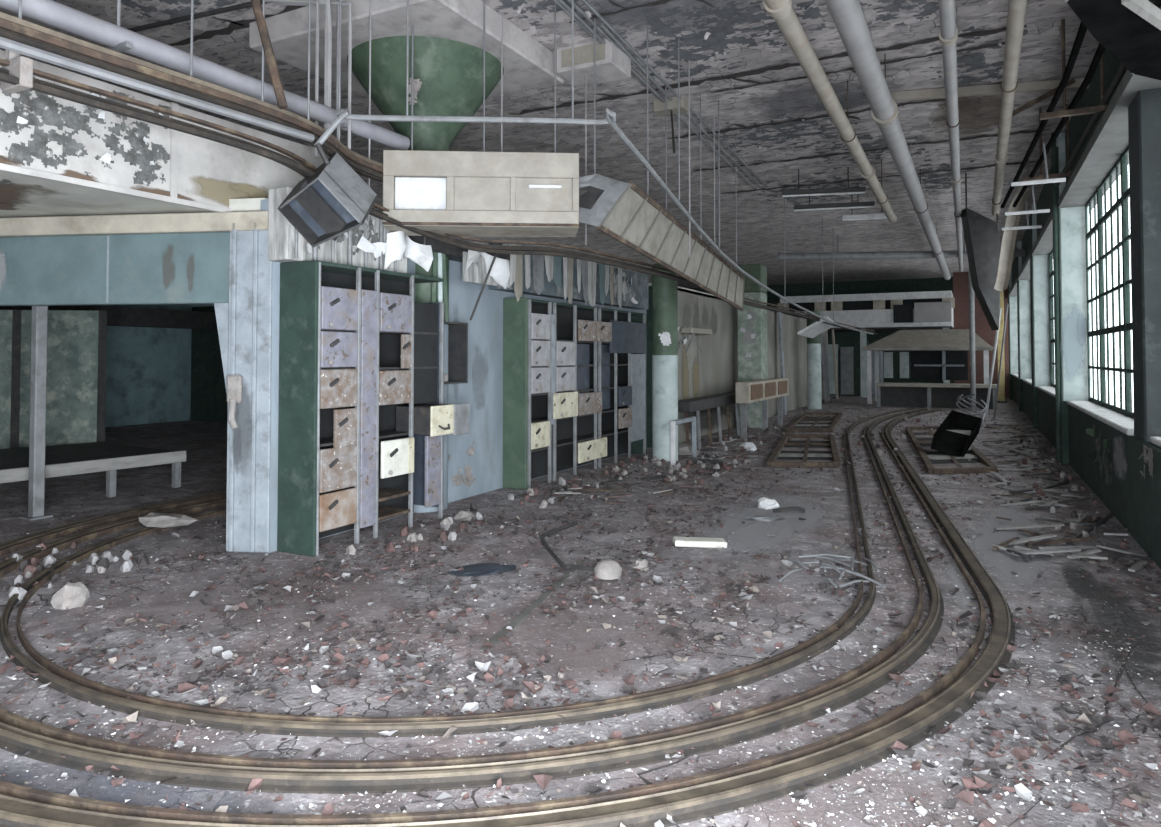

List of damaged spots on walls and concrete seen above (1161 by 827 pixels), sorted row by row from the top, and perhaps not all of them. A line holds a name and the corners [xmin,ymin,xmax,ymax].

peeling [496,0,591,34]
peeling [619,1,787,81]
crack [509,25,1027,115]
peeling [796,0,826,41]
peeling [860,0,939,33]
peeling [929,26,1004,85]
peeling [0,76,171,186]
peeling [701,114,891,208]
peeling [905,136,975,195]